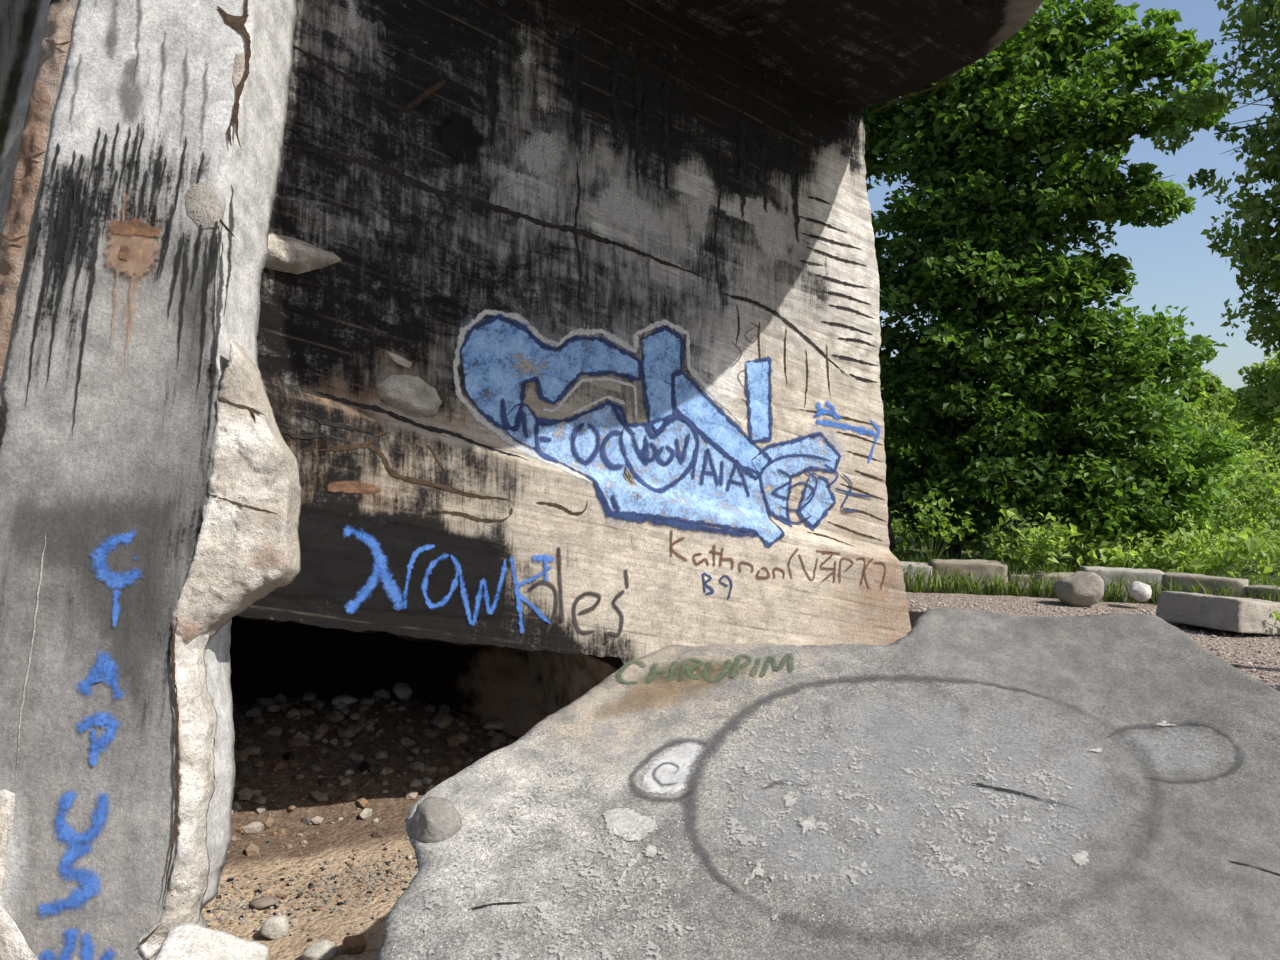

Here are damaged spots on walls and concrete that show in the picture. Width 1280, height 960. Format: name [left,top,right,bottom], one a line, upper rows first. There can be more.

leakage [14,0,234,440]
rust [105,192,161,376]
crack [216,0,251,150]
leakage [346,0,366,34]
crack [293,45,440,127]
leakage [485,42,500,146]
leakage [518,131,563,176]
leakage [537,94,555,113]
crack [284,133,887,546]
leakage [597,41,668,239]
leakage [737,110,800,260]
crack [210,384,588,523]